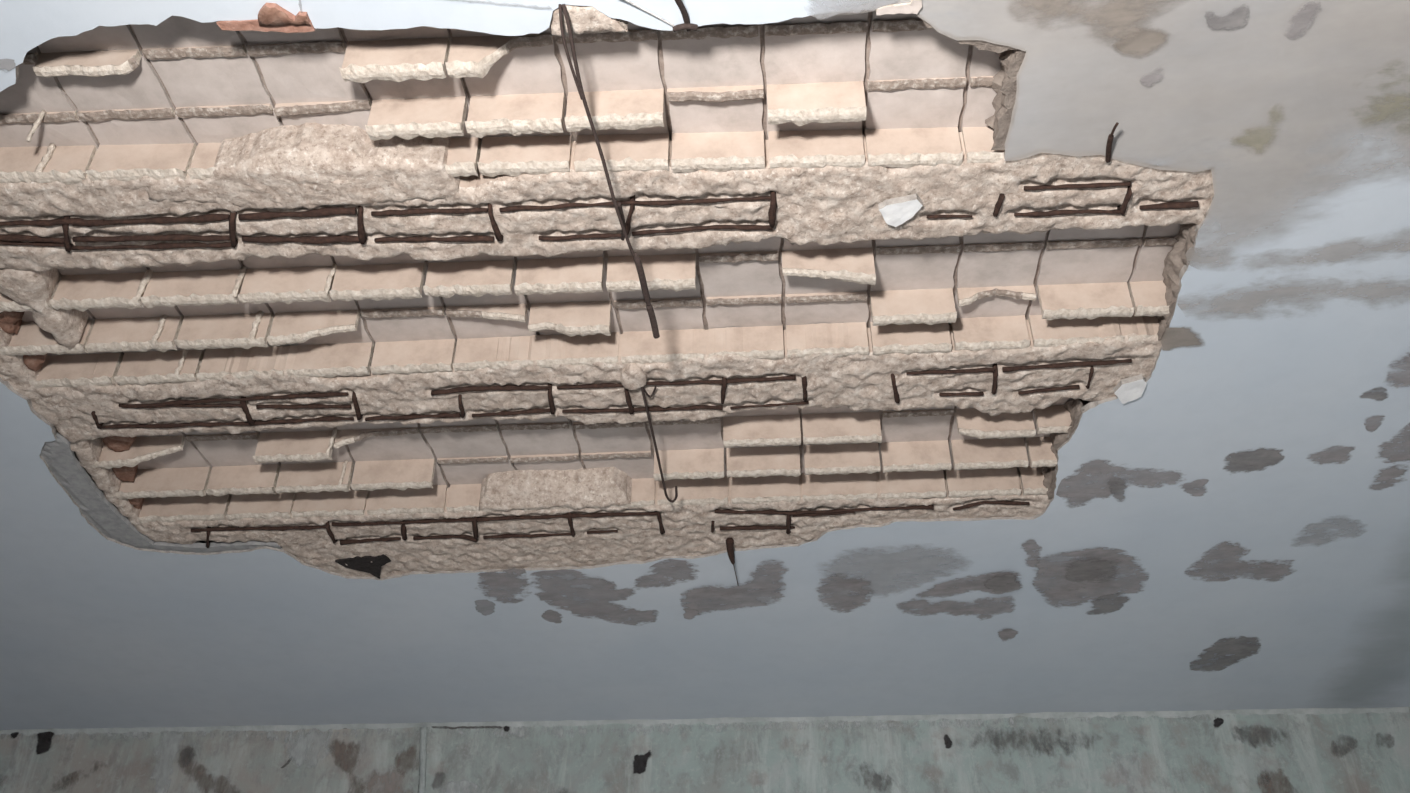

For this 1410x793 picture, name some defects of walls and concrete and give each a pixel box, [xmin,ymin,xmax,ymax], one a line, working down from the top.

water stain [857,0,1410,261]
spalling [0,0,1214,625]
water stain [1207,283,1406,313]
water stain [1161,327,1202,351]
peeling [1224,448,1284,472]
water stain [1236,727,1285,748]